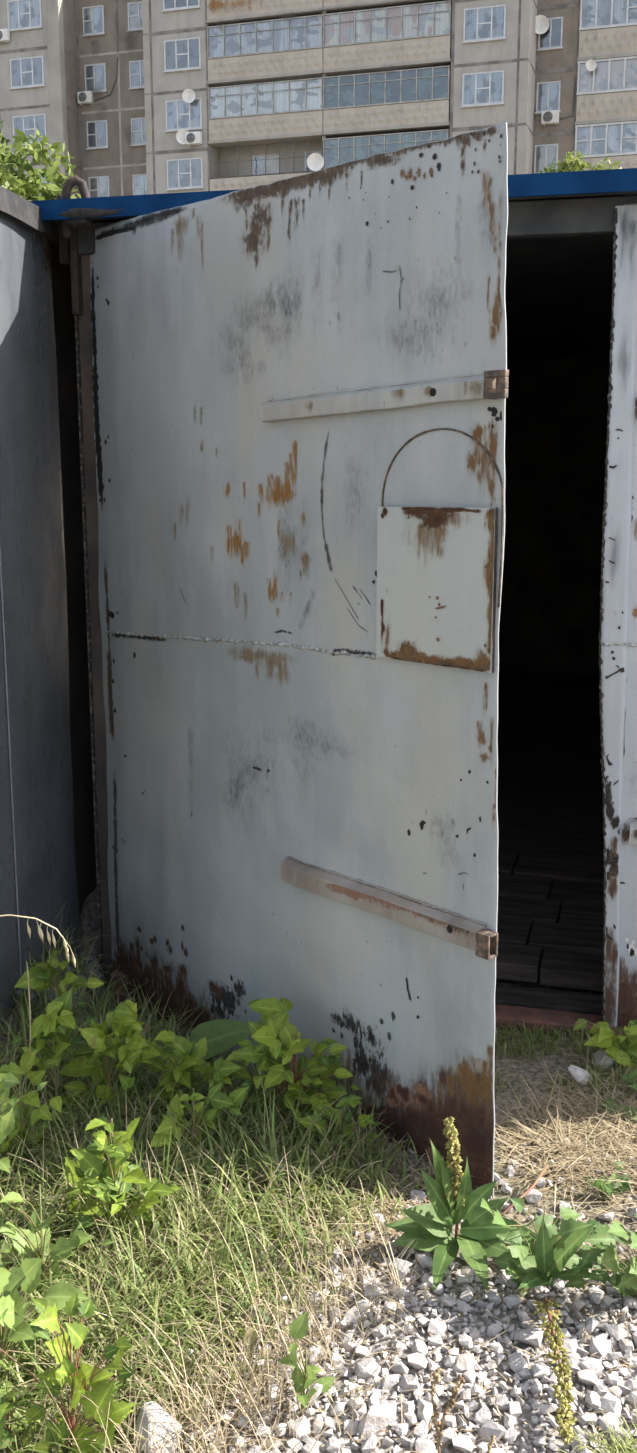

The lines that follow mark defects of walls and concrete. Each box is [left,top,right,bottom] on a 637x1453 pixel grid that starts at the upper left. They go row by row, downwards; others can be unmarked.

rust [229,126,496,267]
rust [482,174,502,339]
rust [212,526,248,563]
rust [233,649,287,681]
rust [226,441,308,575]
rust [268,575,291,615]
rust [380,421,497,820]
rust [608,875,617,899]
rust [605,931,637,1027]
rust [333,1046,493,1196]